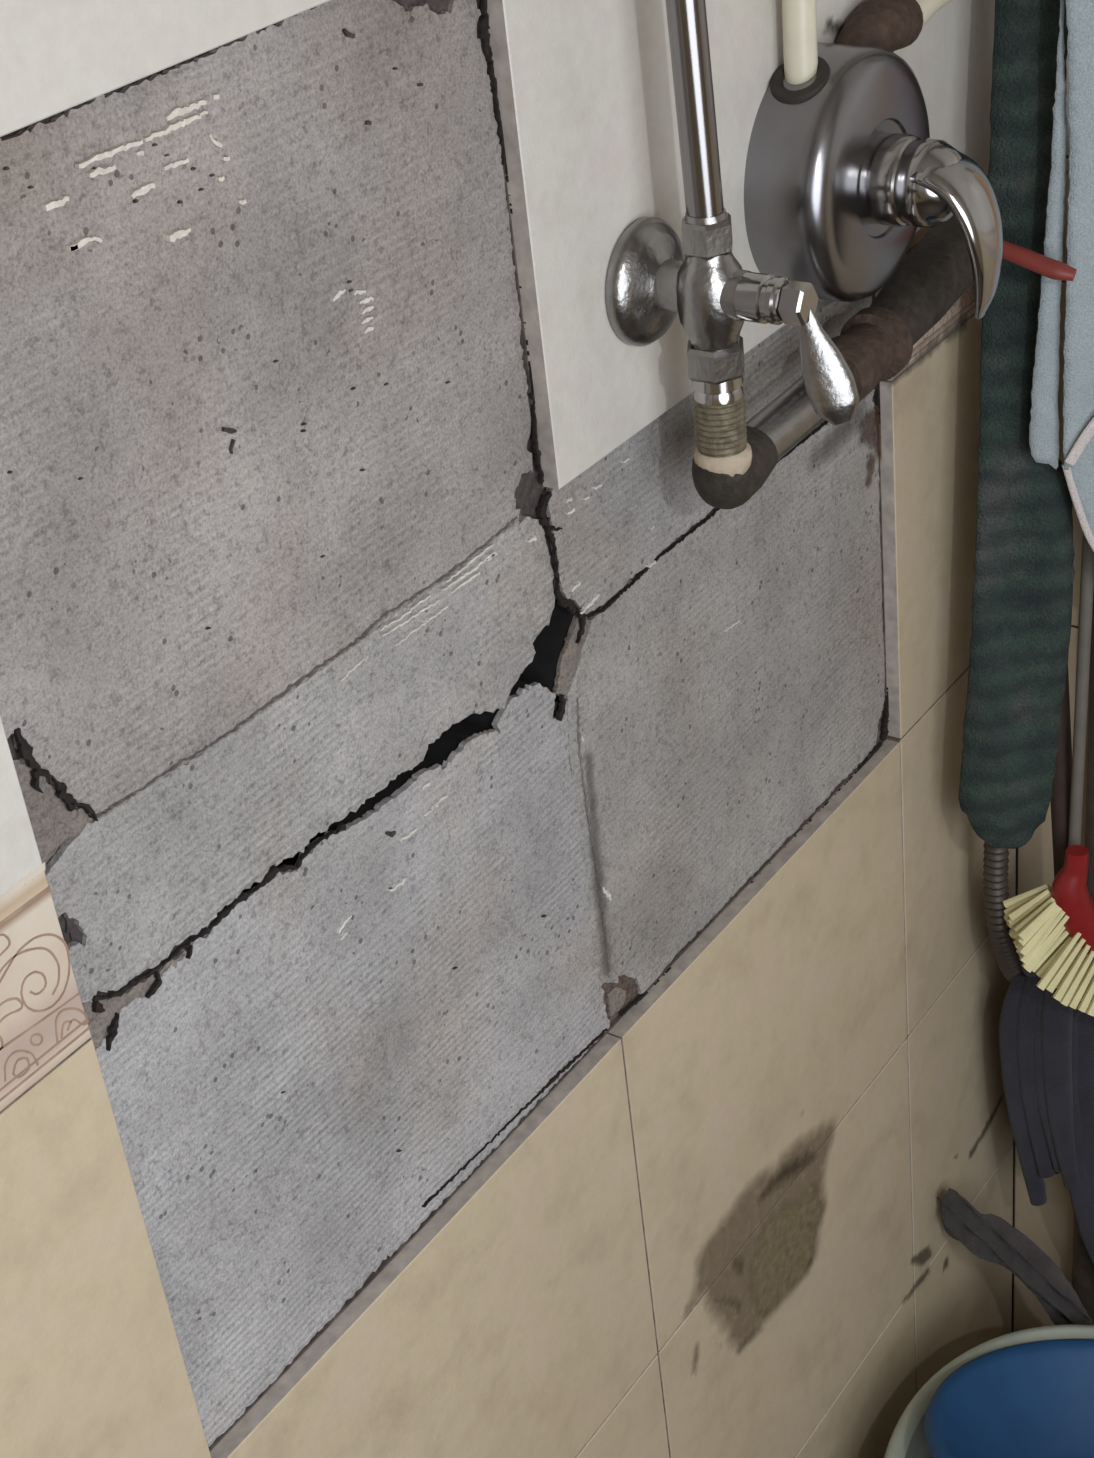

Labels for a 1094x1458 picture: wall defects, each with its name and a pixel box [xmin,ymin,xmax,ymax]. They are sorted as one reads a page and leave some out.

crack [477,0,513,214]
spalling [0,0,533,815]
spalling [742,324,802,422]
crack [777,421,829,463]
spalling [815,295,872,339]
crack [873,382,881,421]
crack [13,286,720,1208]
crack [751,687,889,883]
spalling [7,389,885,1447]
water stain [699,1130,831,1344]